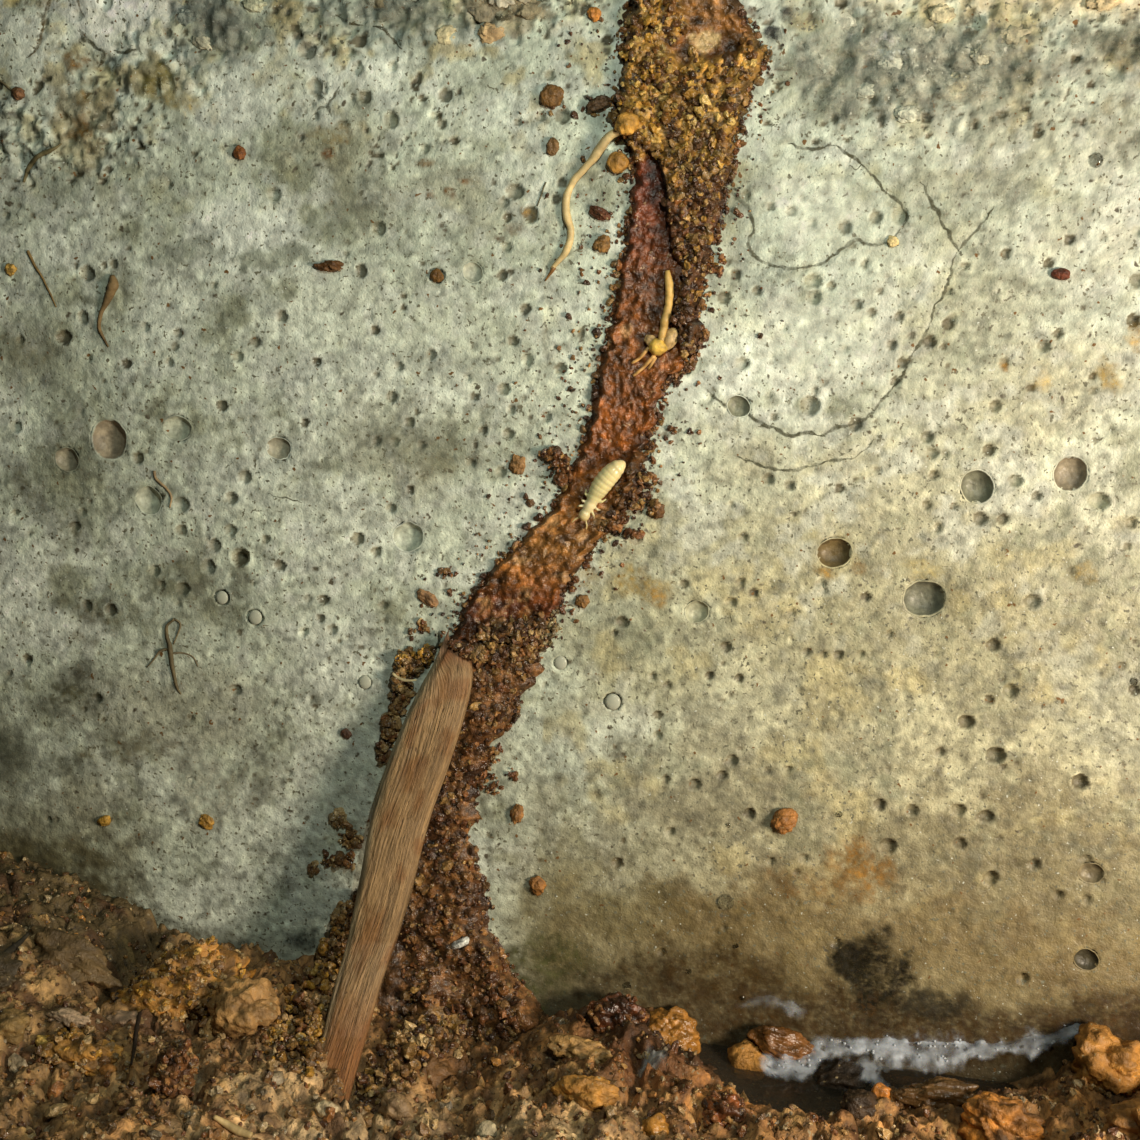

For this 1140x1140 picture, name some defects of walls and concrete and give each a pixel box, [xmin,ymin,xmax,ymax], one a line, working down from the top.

crack [713,143,994,471]
leakage [620,926,1140,1084]